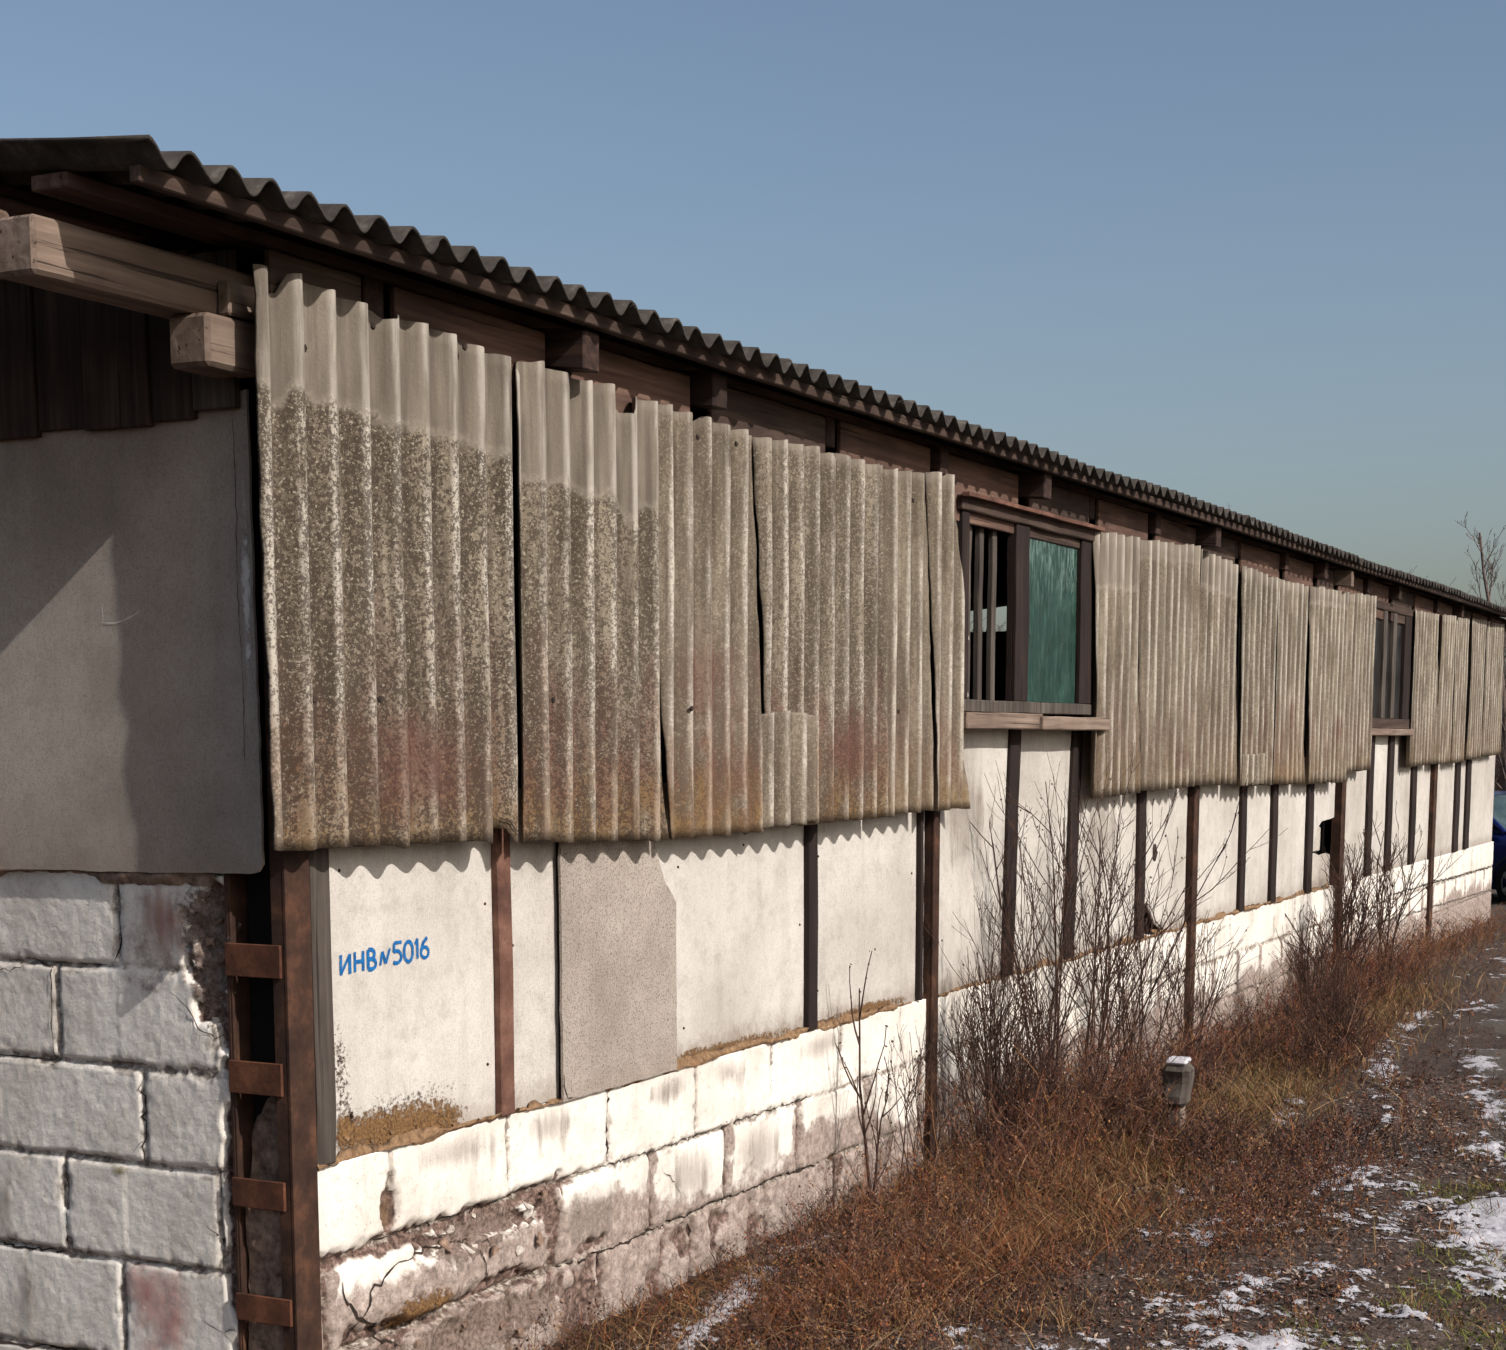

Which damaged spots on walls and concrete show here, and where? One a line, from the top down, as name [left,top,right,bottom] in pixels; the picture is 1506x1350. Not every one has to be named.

spalling [174,878,241,1027]
crack [342,1199,500,1346]
spalling [390,1284,571,1350]
spalling [414,1189,550,1269]